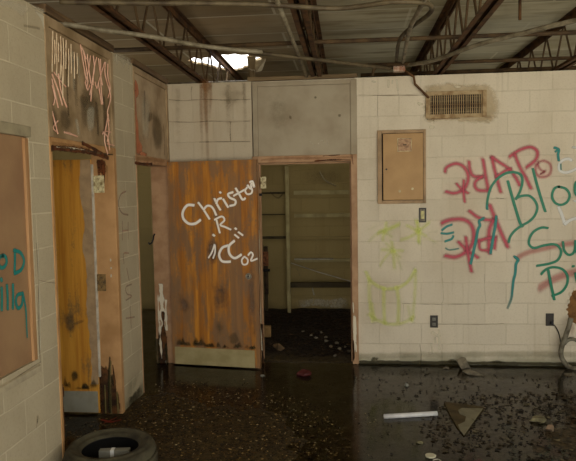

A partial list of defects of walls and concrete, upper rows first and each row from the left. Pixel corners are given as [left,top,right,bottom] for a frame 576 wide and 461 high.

rust [51,141,109,182]